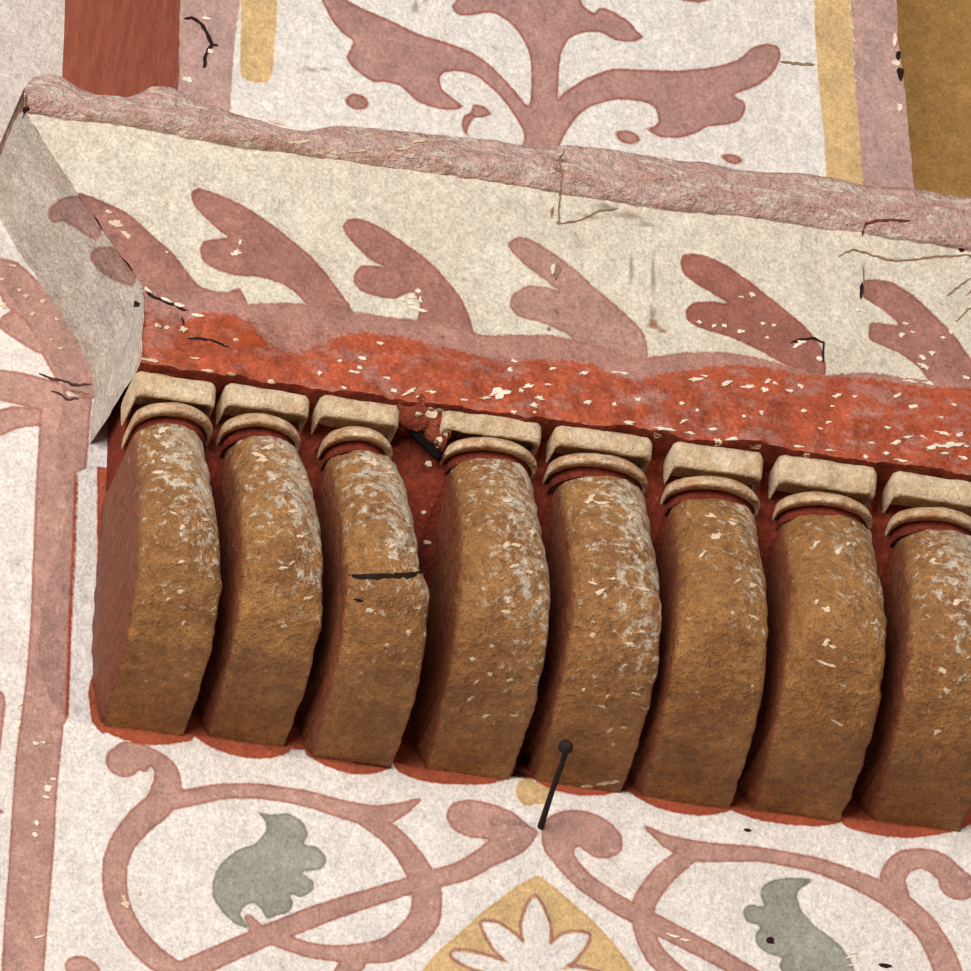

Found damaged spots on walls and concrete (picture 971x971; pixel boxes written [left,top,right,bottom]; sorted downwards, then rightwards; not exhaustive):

crack [182,16,218,83]
crack [551,149,618,225]
crack [551,263,561,279]
crack [839,218,971,312]
crack [790,337,825,362]
peeling [460,383,552,414]
peeling [721,378,804,393]
peeling [651,408,700,438]
peeling [863,430,969,463]
crack [348,570,427,602]